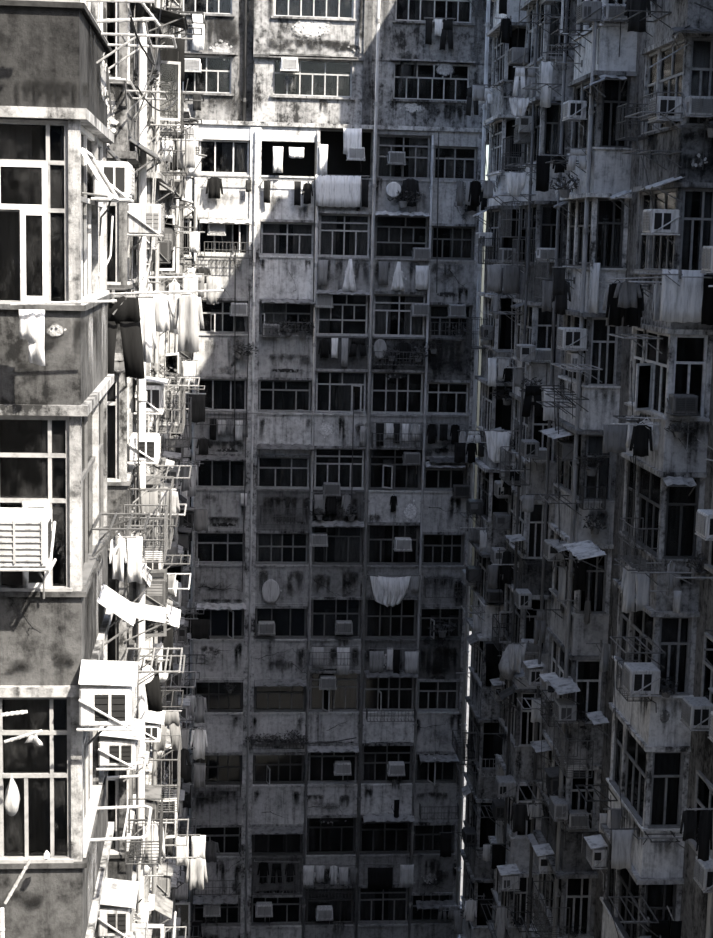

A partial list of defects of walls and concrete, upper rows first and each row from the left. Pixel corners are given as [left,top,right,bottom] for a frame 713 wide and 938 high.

damp [264,496,356,524]